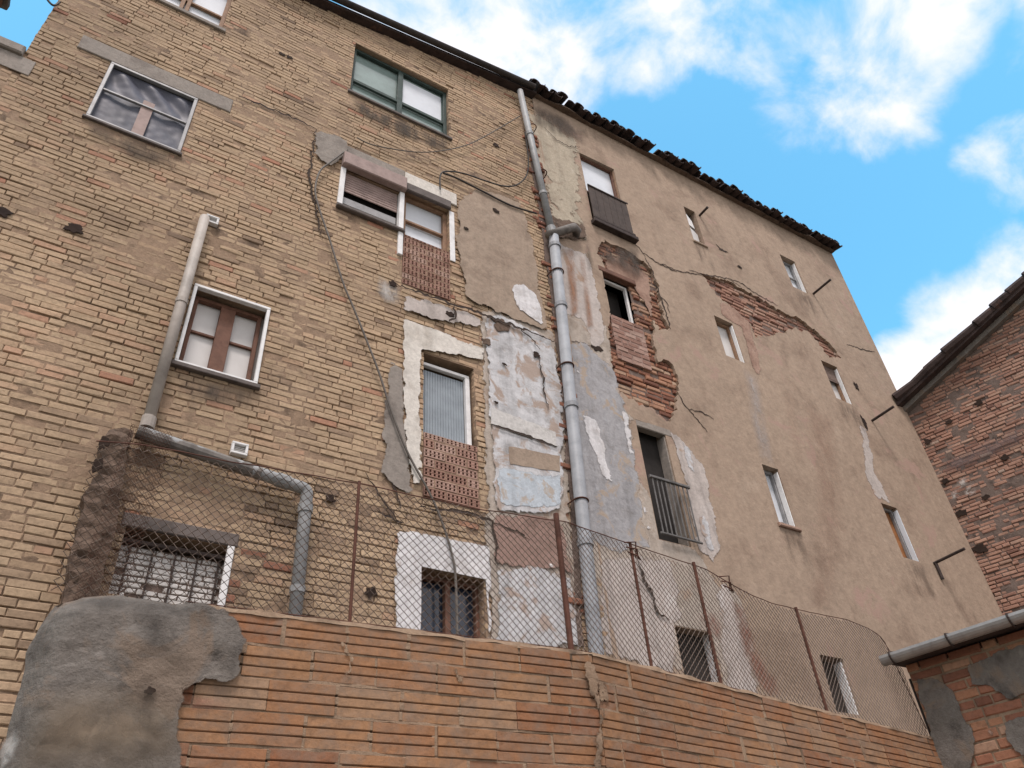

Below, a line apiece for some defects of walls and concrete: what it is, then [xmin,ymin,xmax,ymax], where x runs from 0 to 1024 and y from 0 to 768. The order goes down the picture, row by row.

crack [239,96,323,239]
flaking render [394,111,760,693]
crack [635,244,776,329]
spalling [705,277,839,384]